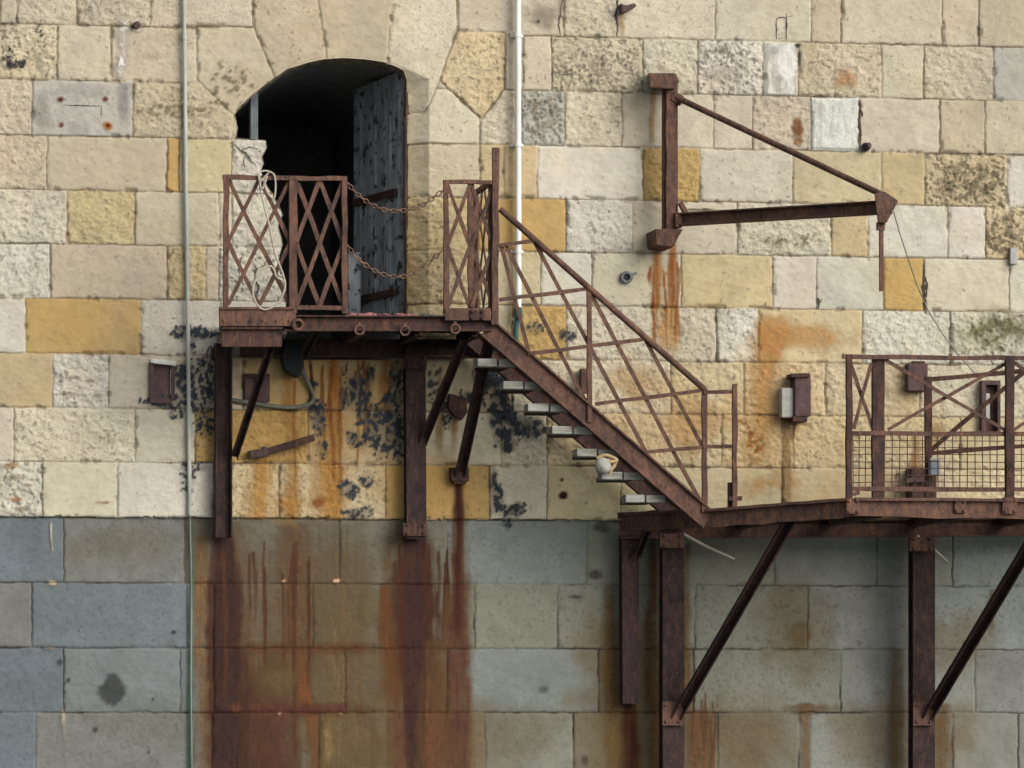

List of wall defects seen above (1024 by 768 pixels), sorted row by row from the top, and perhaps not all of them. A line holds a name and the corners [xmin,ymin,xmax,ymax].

rust [793,117,804,145]
crack [236,145,258,173]
rust [647,244,681,346]
rust [193,360,472,768]
water stain [100,674,125,705]